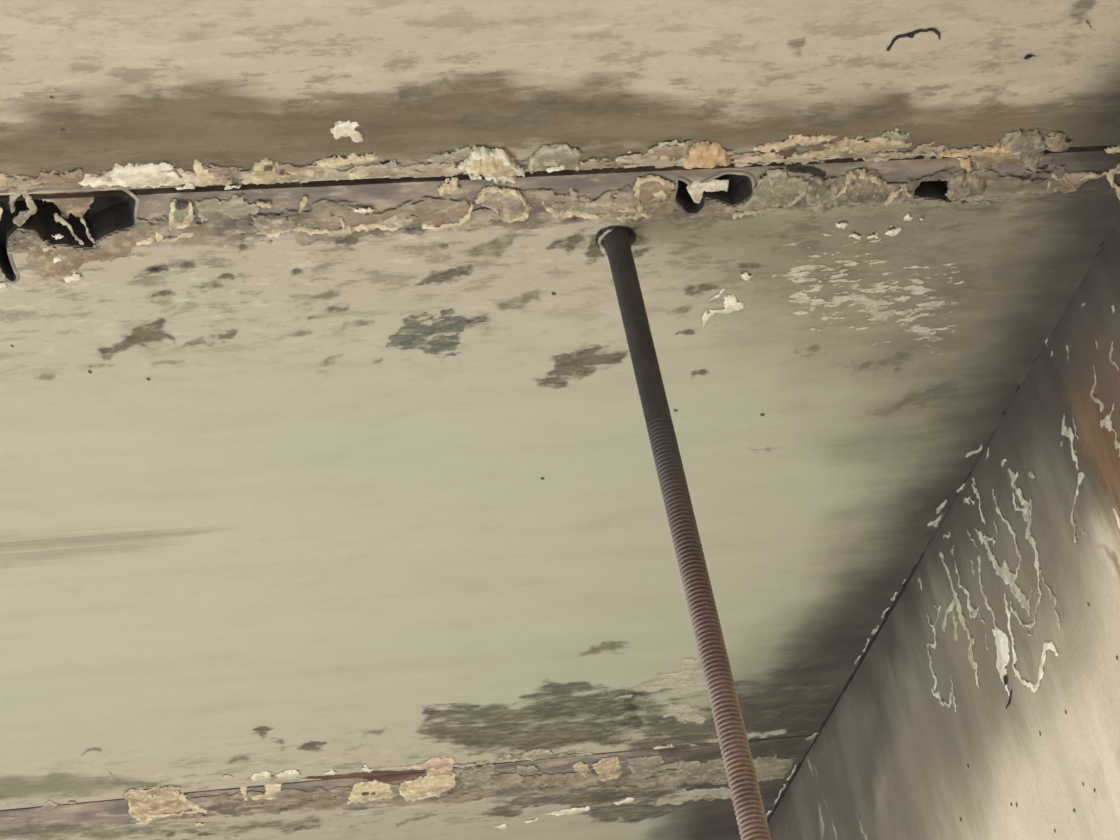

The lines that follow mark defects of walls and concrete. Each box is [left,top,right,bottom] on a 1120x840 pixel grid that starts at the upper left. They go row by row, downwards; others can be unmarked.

peeling [330,120,363,142]
hole [0,188,140,284]
damp [0,143,691,285]
hole [673,171,756,216]
hole [913,177,949,203]
damp [100,319,173,354]
damp [387,309,487,356]
damp [539,347,627,388]
damp [615,115,1120,840]
damp [588,642,621,653]
damp [124,658,741,840]